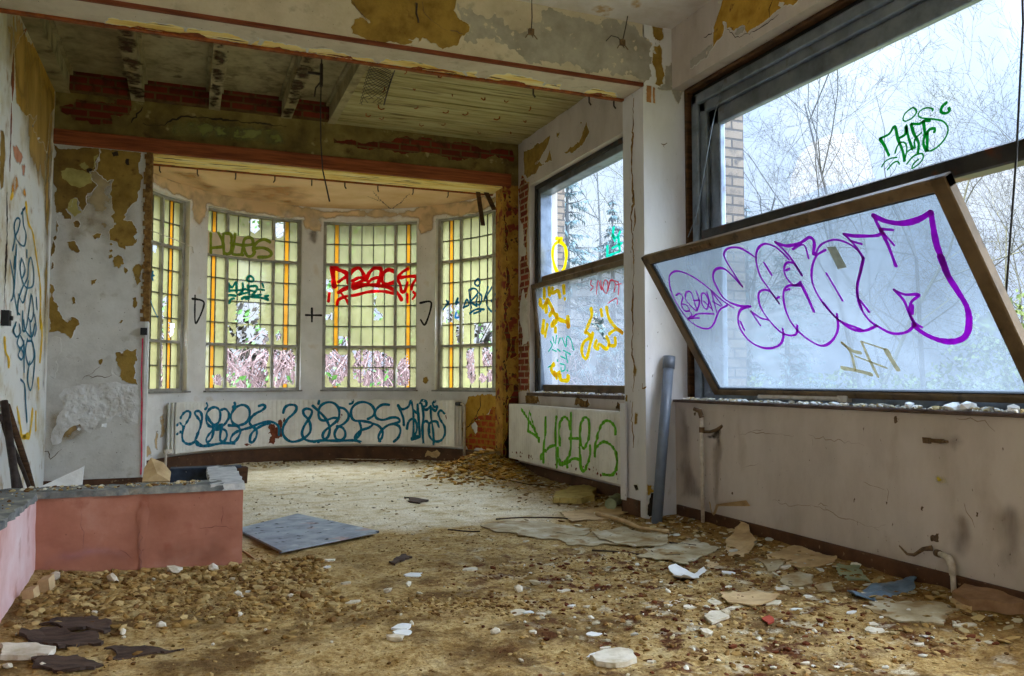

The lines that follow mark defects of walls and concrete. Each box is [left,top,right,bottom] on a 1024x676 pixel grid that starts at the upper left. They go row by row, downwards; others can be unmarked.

peeling [104,17,562,90]
peeling [350,0,683,104]
peeling [712,0,802,48]
crack [131,107,286,127]
peeling [14,31,144,309]
peeling [48,283,80,339]
spalling [333,121,590,462]
peeling [98,348,138,385]